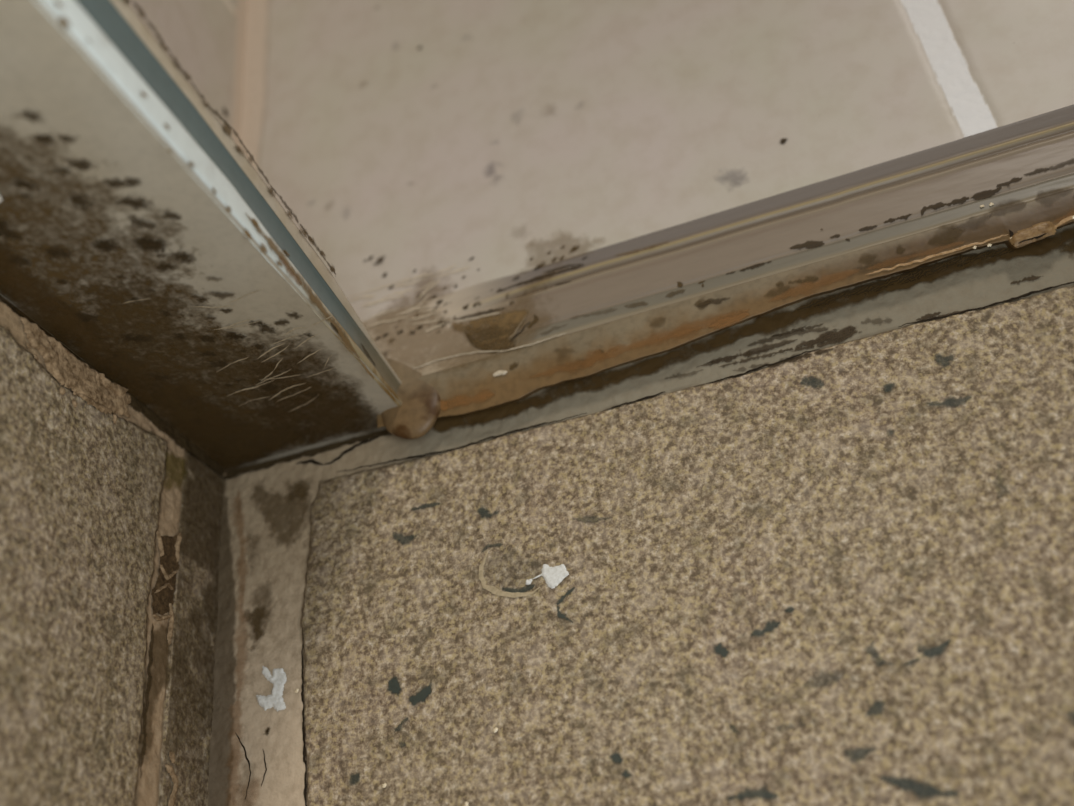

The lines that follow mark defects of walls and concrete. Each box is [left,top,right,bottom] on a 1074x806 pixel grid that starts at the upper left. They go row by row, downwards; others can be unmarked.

damp [0,133,389,488]
damp [125,0,336,275]
damp [433,227,1074,432]
damp [790,159,1074,249]
peeling [865,215,1074,275]
damp [247,608,264,640]